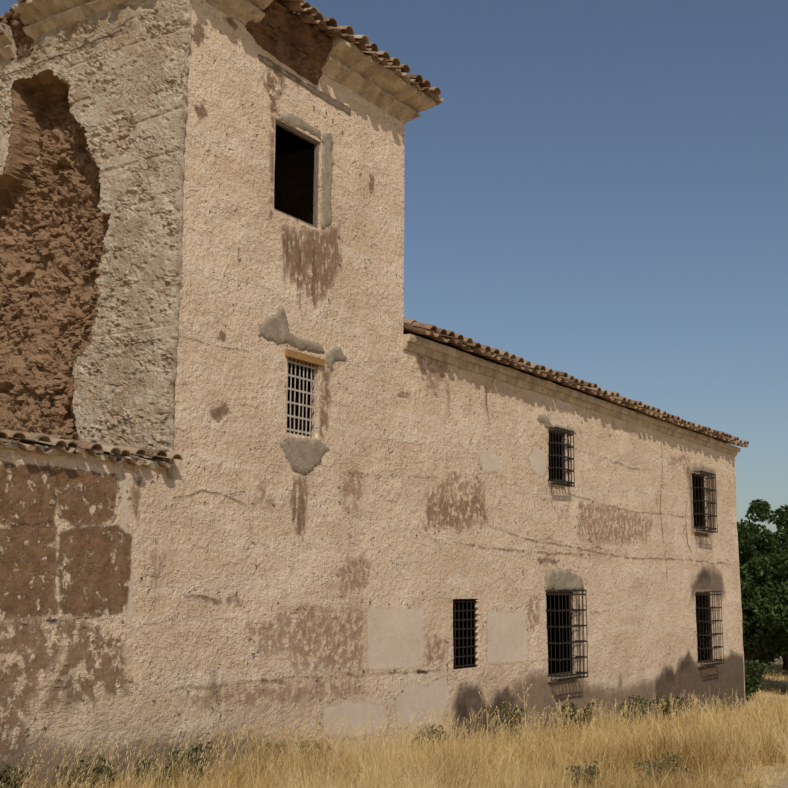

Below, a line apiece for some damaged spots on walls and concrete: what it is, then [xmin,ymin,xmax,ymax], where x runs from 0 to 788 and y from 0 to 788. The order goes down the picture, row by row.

spalling [226,0,333,217]
spalling [0,69,111,441]
crack [178,489,244,504]
flaking render [424,448,500,533]
crack [468,443,722,565]
flaking render [565,500,650,544]
flaking render [0,462,133,761]
flaking render [246,605,361,700]